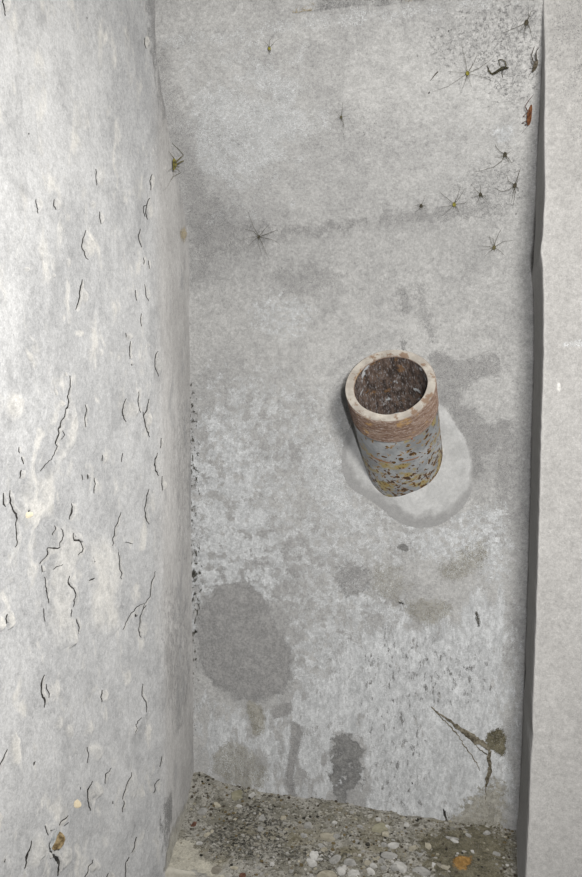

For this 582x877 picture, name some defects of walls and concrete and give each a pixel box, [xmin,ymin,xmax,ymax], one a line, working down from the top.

crack [138,198,153,247]
crack [75,279,89,312]
crack [138,392,164,448]
crack [3,375,73,551]
crack [144,476,168,524]
crack [73,532,85,558]
damp [161,282,527,821]
crack [123,571,156,638]
crack [40,675,57,708]
crack [135,684,148,733]
crack [0,728,22,773]
crack [22,816,138,877]